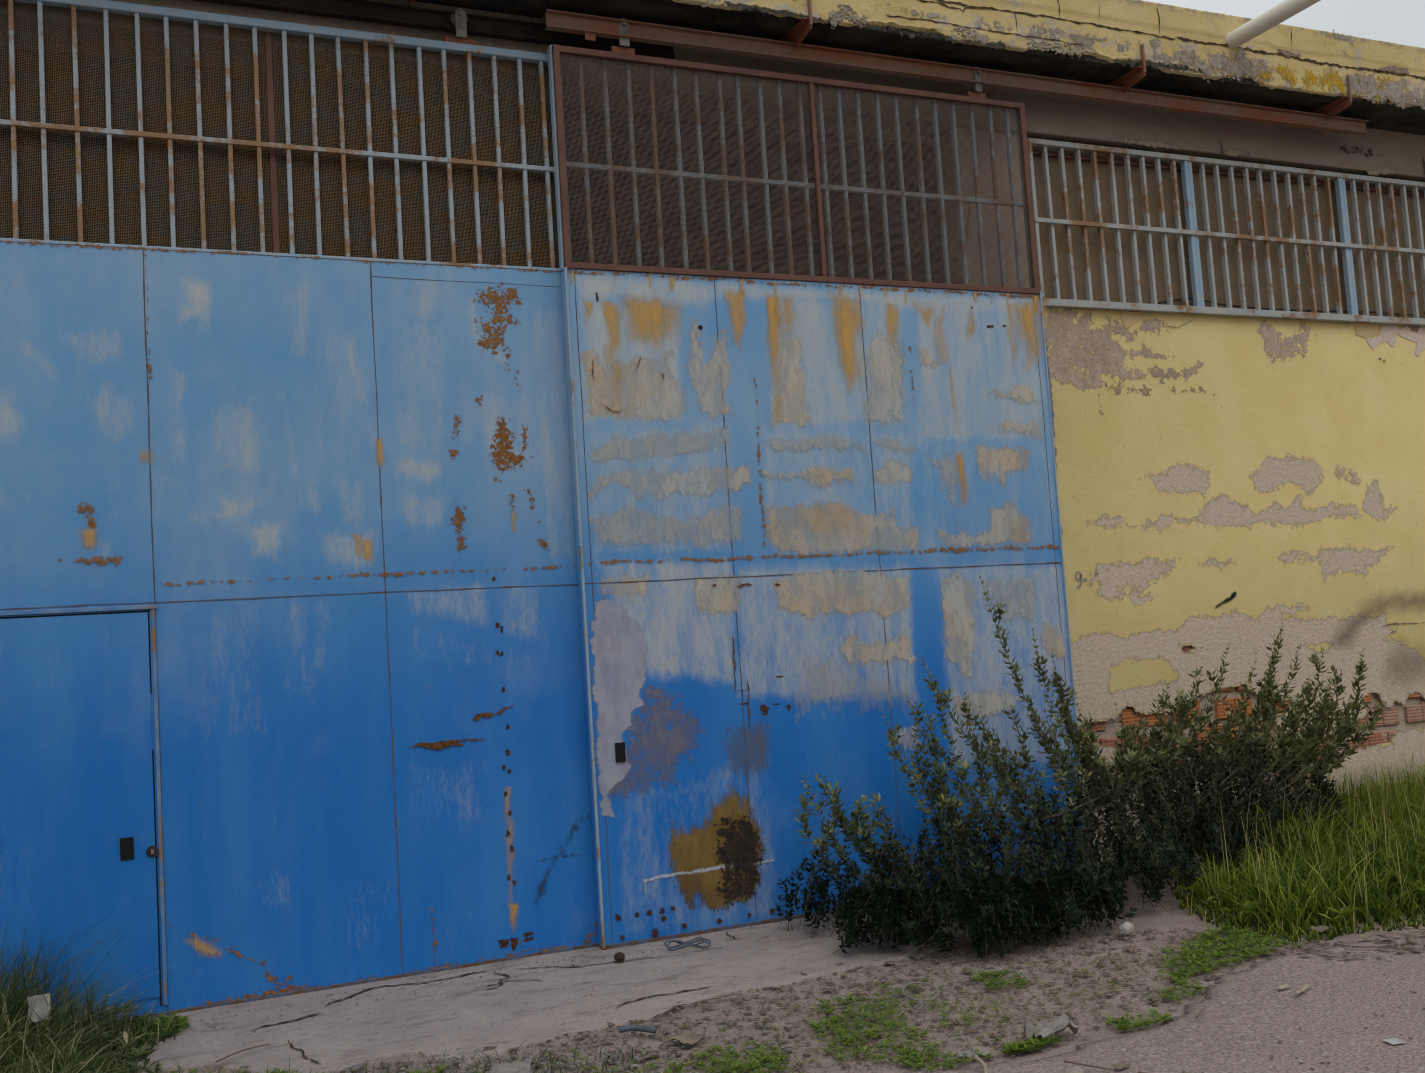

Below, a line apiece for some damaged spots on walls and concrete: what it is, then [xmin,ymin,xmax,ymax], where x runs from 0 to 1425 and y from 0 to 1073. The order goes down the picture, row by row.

rust [358,260,1044,390]
peeling [1044,308,1215,421]
rust [58,502,122,568]
rust [165,415,1059,586]
peeling [580,322,919,619]
peeling [939,502,1030,548]
peeling [1087,453,1397,531]
peeling [941,572,1022,718]
peeling [1042,603,1425,862]
rust [501,749,514,852]
rust [615,785,765,940]
rust [478,904,598,962]